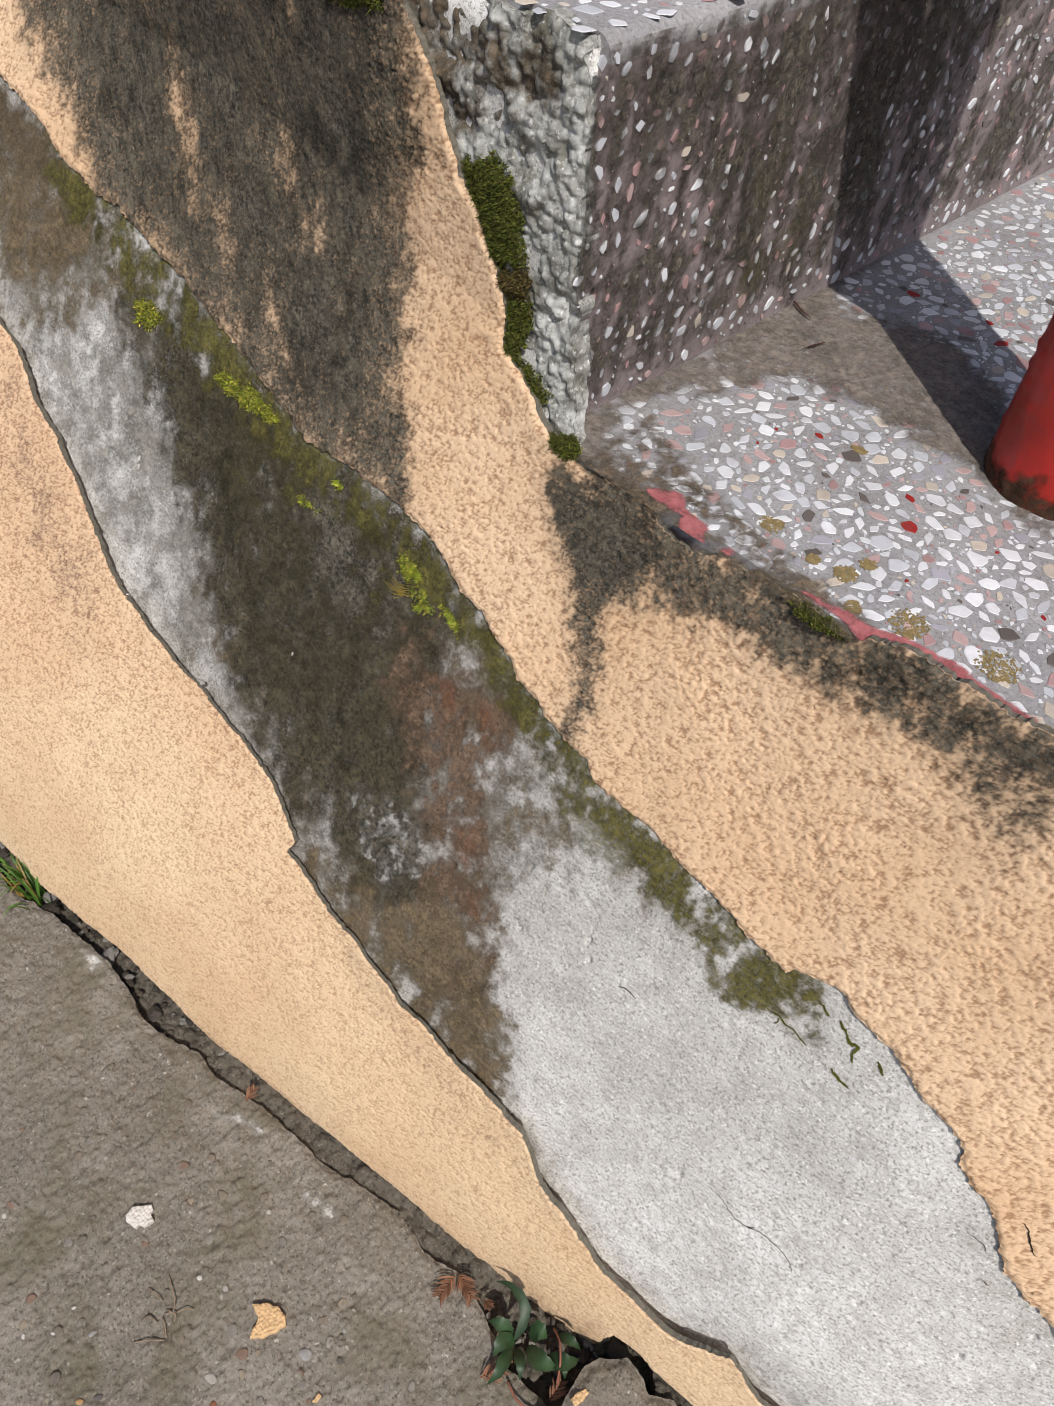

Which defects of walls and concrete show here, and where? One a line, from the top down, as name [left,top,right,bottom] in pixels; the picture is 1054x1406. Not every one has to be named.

peeling [515,0,683,32]
peeling [0,76,81,184]
peeling [573,0,1054,728]
leakage [0,0,591,1097]
leakage [545,464,1054,836]
peeling [384,961,425,1011]
peeling [425,990,478,1083]